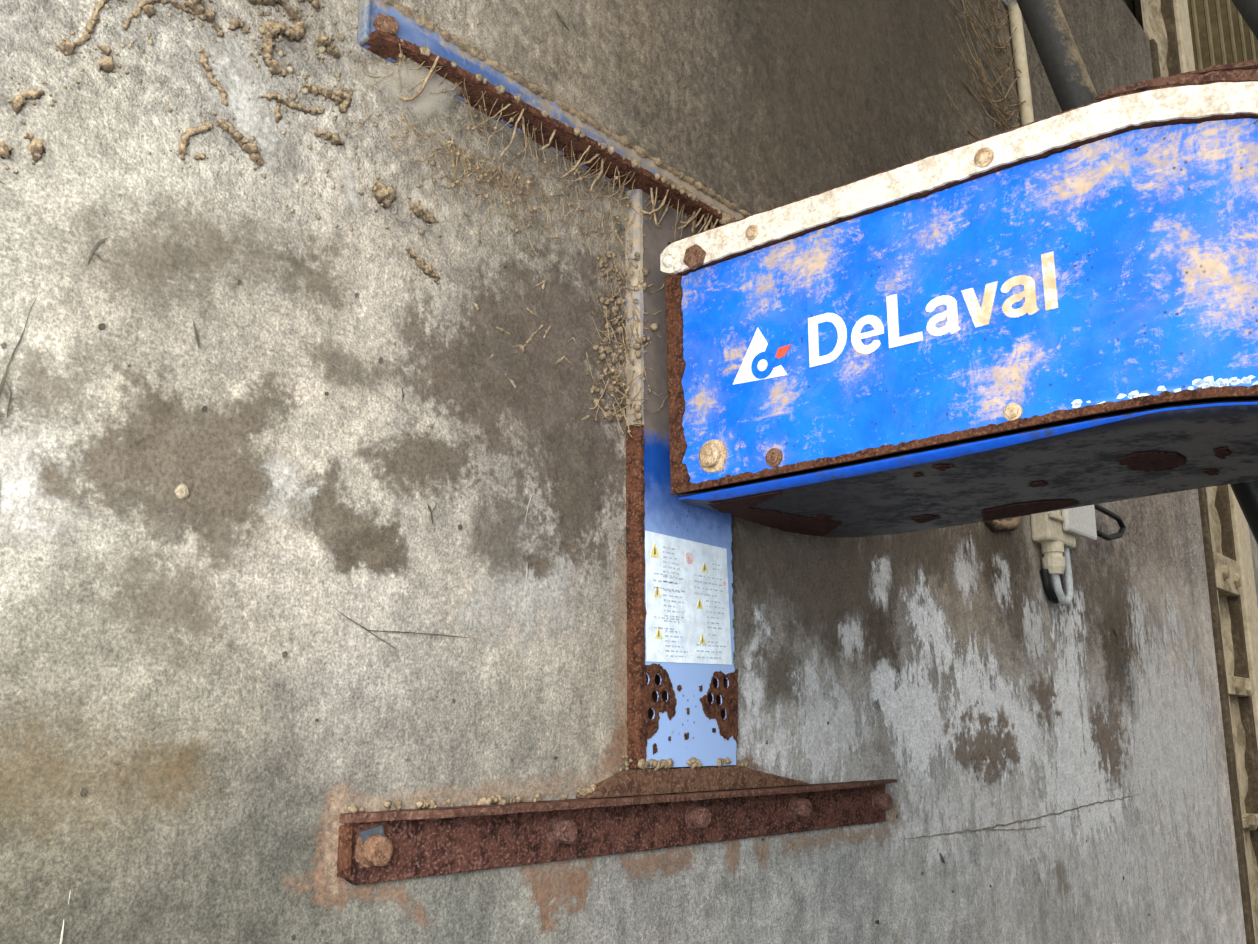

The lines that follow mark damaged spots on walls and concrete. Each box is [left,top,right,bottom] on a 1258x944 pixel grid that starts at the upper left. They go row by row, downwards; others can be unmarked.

leakage [114,210,341,304]
crack [0,296,38,418]
leakage [40,366,293,566]
leakage [293,460,406,573]
leakage [313,243,627,578]
leakage [731,519,1033,704]
leakage [1058,541,1147,705]
corrosion [290,539,760,930]
crack [904,794,1140,864]